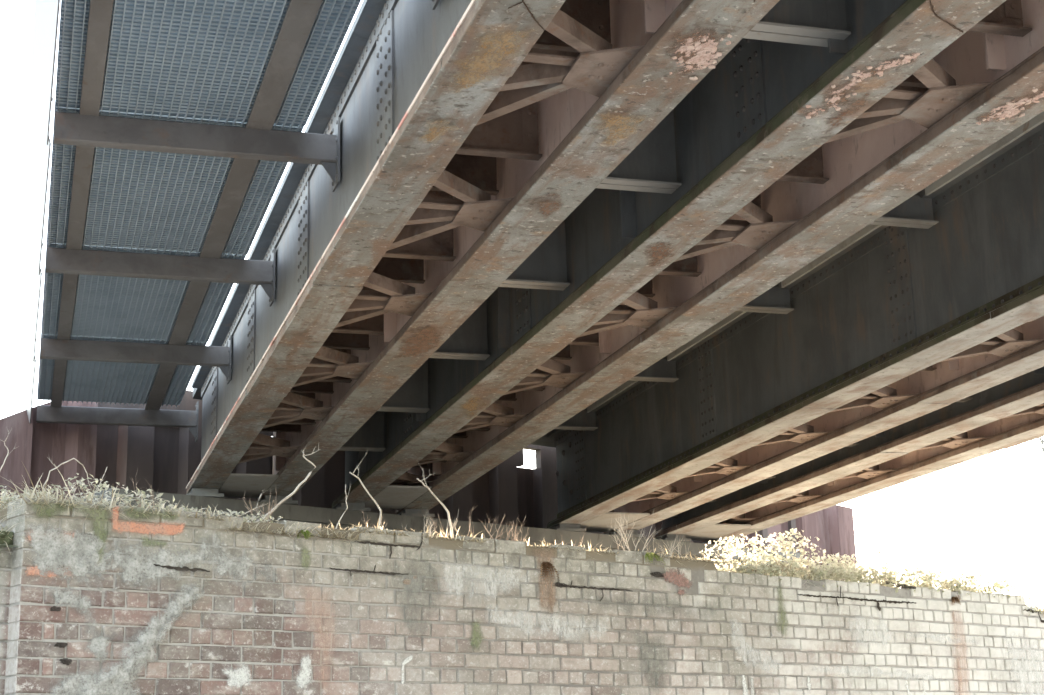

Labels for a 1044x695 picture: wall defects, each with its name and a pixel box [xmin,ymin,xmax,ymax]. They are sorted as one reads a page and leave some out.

crack [930,0,964,33]
peeling [666,28,732,80]
peeling [799,53,920,119]
peeling [975,88,1044,125]
crack [330,533,423,576]
crack [566,581,630,602]
crack [798,586,916,611]